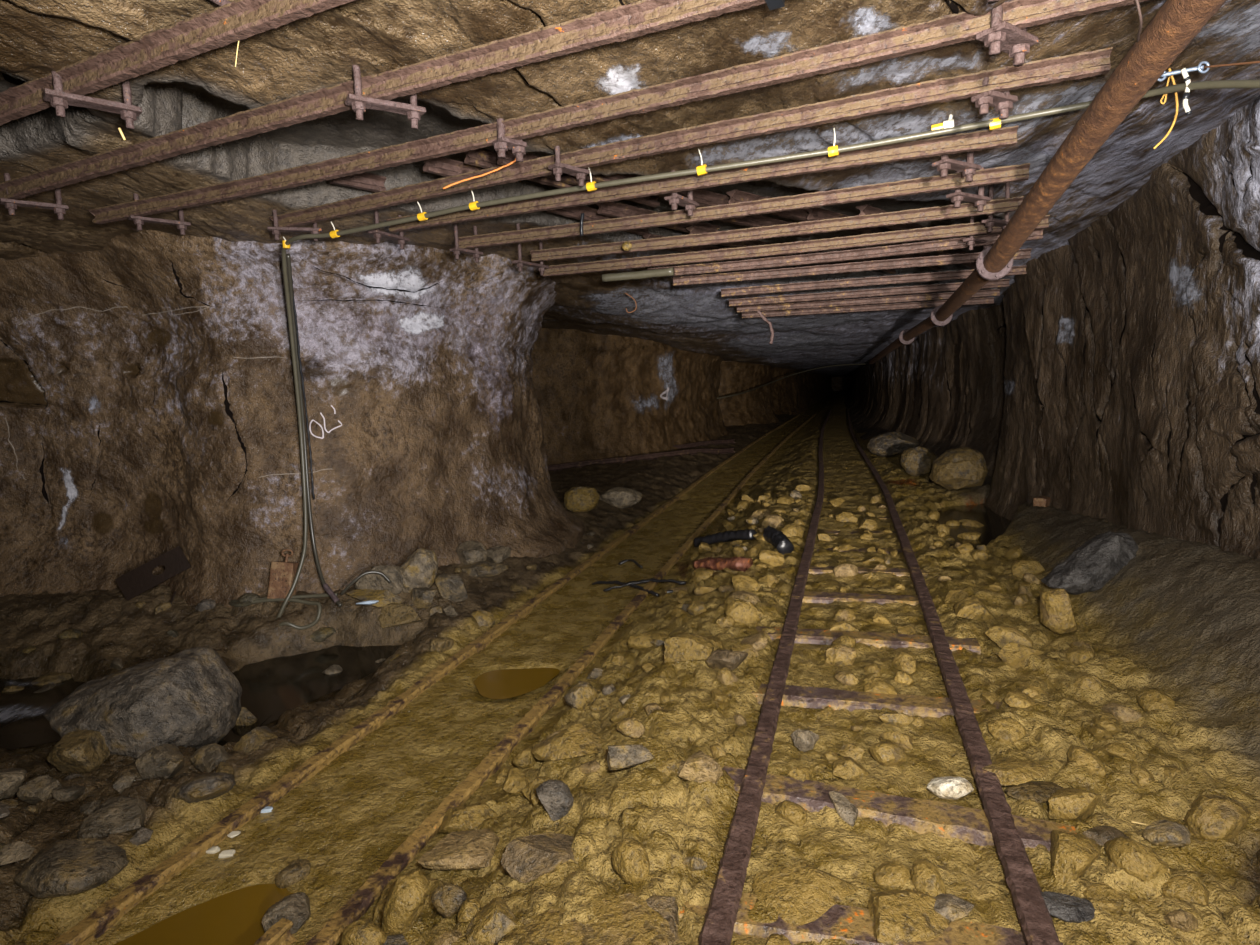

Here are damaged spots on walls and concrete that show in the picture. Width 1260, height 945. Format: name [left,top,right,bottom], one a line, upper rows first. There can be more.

leakage [360,267,444,334]
crack [1024,252,1202,491]
crack [1235,342,1260,444]
crack [1208,472,1257,533]